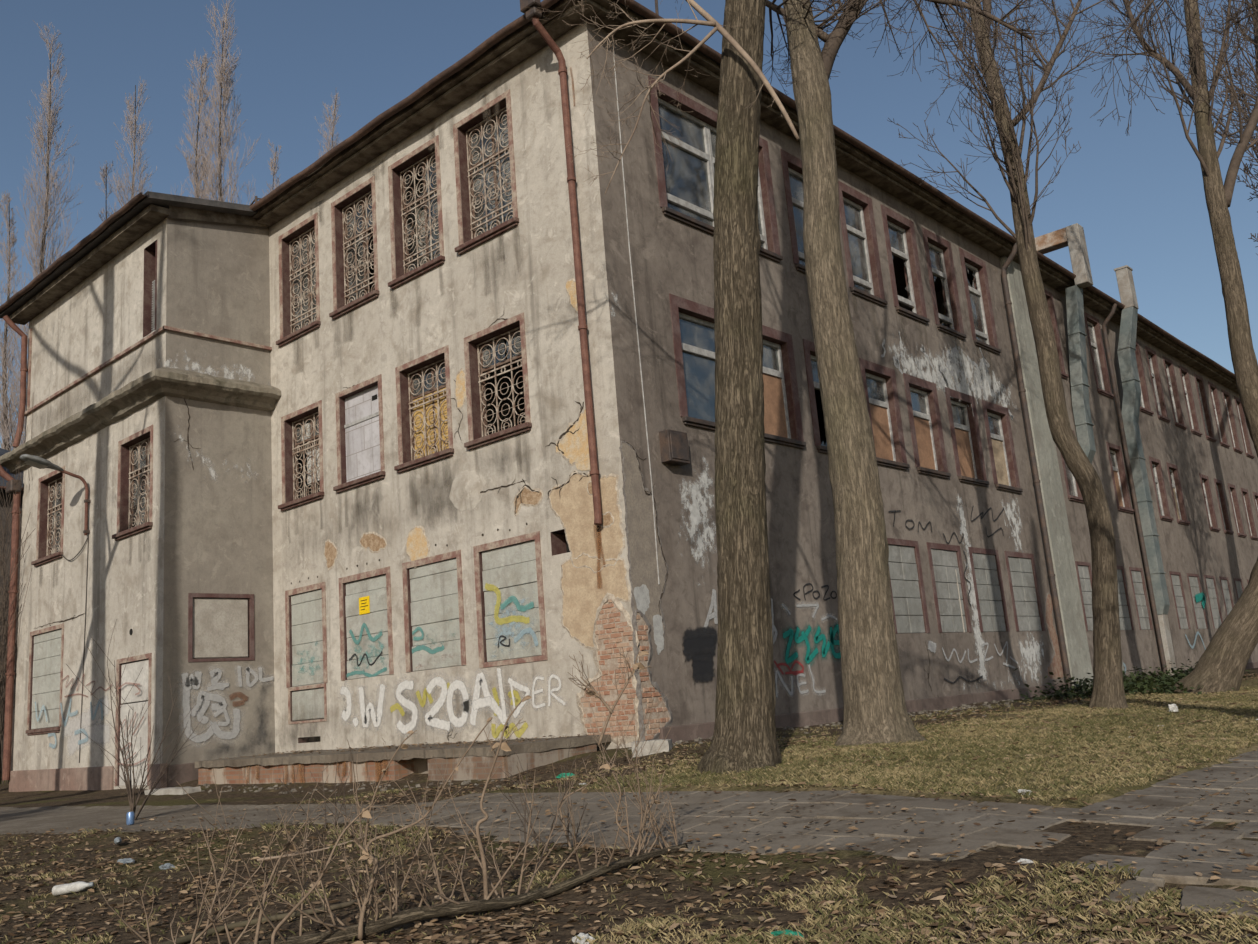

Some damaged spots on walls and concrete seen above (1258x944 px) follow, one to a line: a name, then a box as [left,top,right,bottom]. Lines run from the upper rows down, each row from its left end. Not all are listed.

crack [176,399,202,471]
crack [480,401,590,516]
spalling [359,531,387,553]
peeling [405,525,430,568]
spalling [513,407,673,745]
leakage [957,496,986,680]
leakage [1001,498,1022,550]
leakage [1001,627,1044,686]